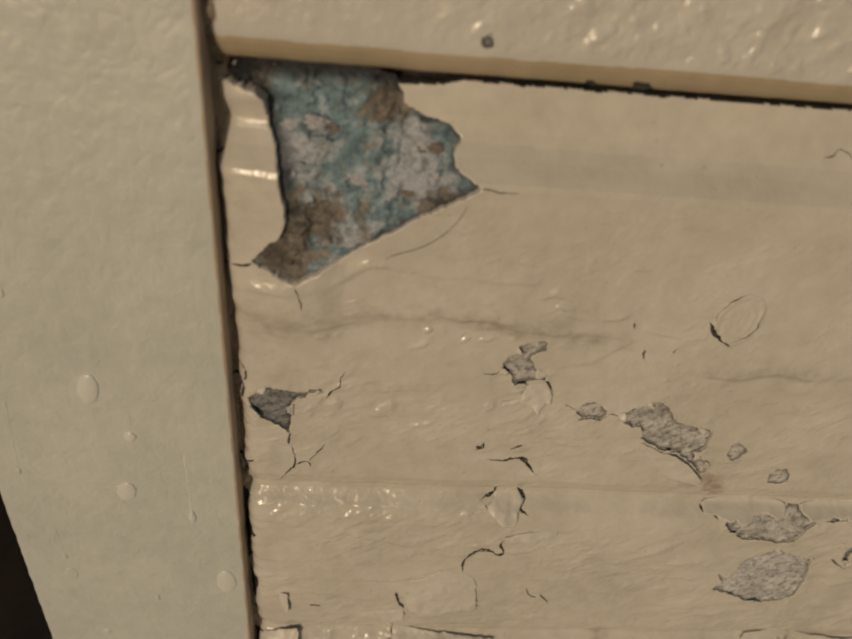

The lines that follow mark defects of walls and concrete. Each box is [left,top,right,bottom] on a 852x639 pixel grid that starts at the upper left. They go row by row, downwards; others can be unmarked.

peeling [227,57,483,279]
crack [710,294,765,347]
peeling [499,339,553,416]
peeling [246,386,324,434]
crack [281,433,325,478]
peeling [573,400,715,486]
peeling [765,468,791,485]
crack [461,542,504,573]
peeling [701,496,852,604]